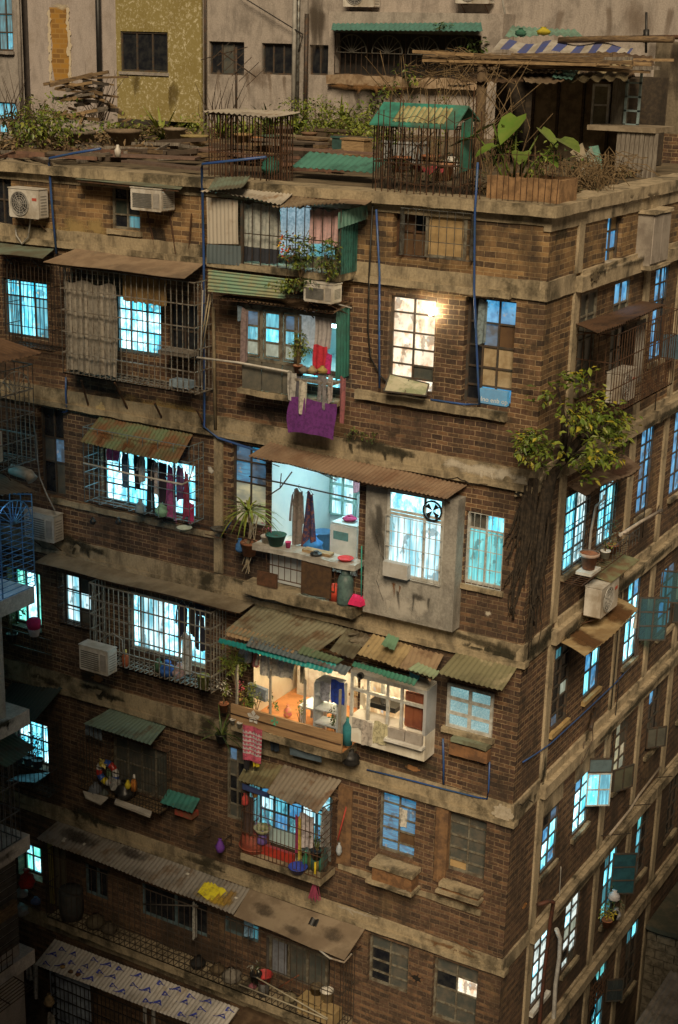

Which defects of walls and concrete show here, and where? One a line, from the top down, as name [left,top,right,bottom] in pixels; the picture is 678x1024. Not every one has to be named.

spalling [47,4,72,83]
leakage [372,506,384,549]
leakage [377,585,430,619]